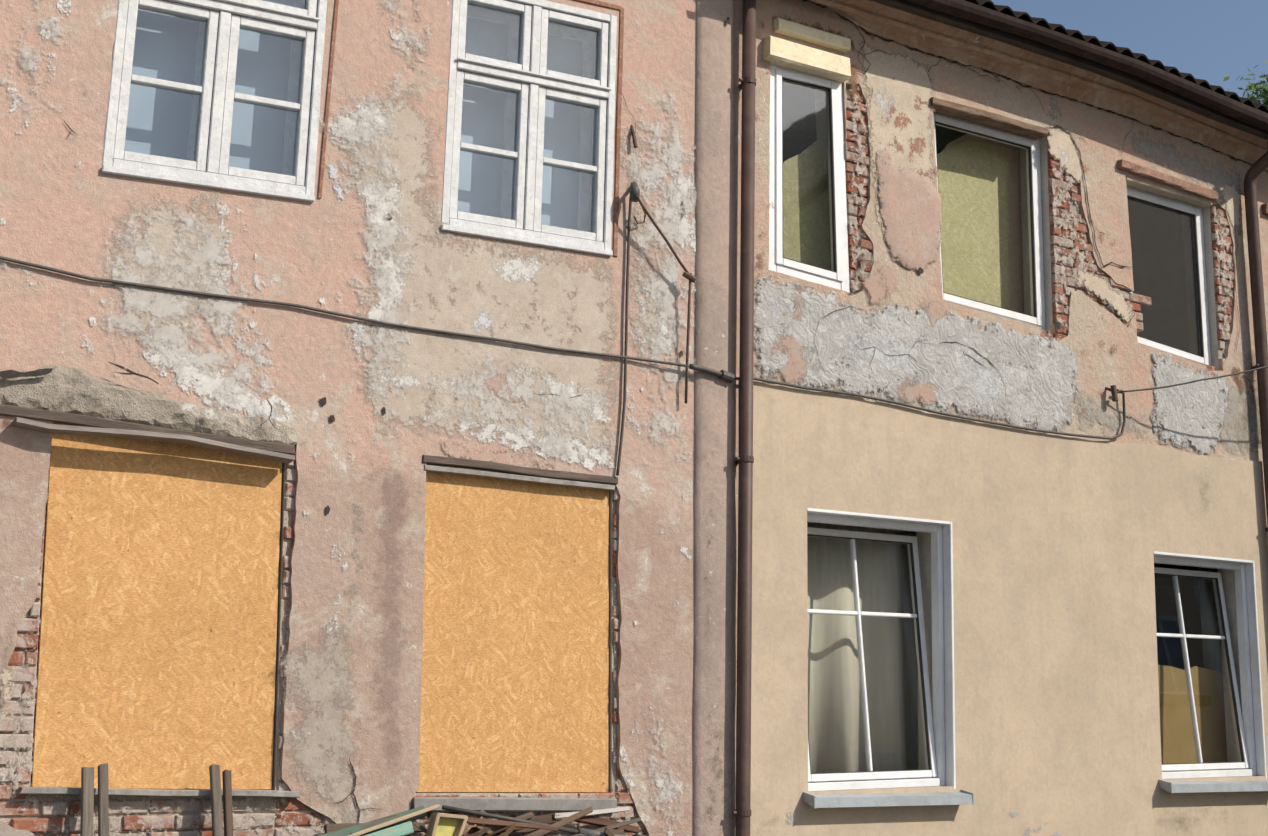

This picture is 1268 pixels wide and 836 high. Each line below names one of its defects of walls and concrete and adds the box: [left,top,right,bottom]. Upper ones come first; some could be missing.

spalling [0,368,53,379]
peeling [82,191,292,423]
peeling [320,0,697,471]
peeling [838,325,939,404]
peeling [844,33,944,304]
peeling [953,341,1004,406]
crack [802,0,1267,268]
spalling [1040,97,1152,341]
peeling [1120,132,1242,371]
spalling [0,454,365,836]
crack [336,757,375,823]